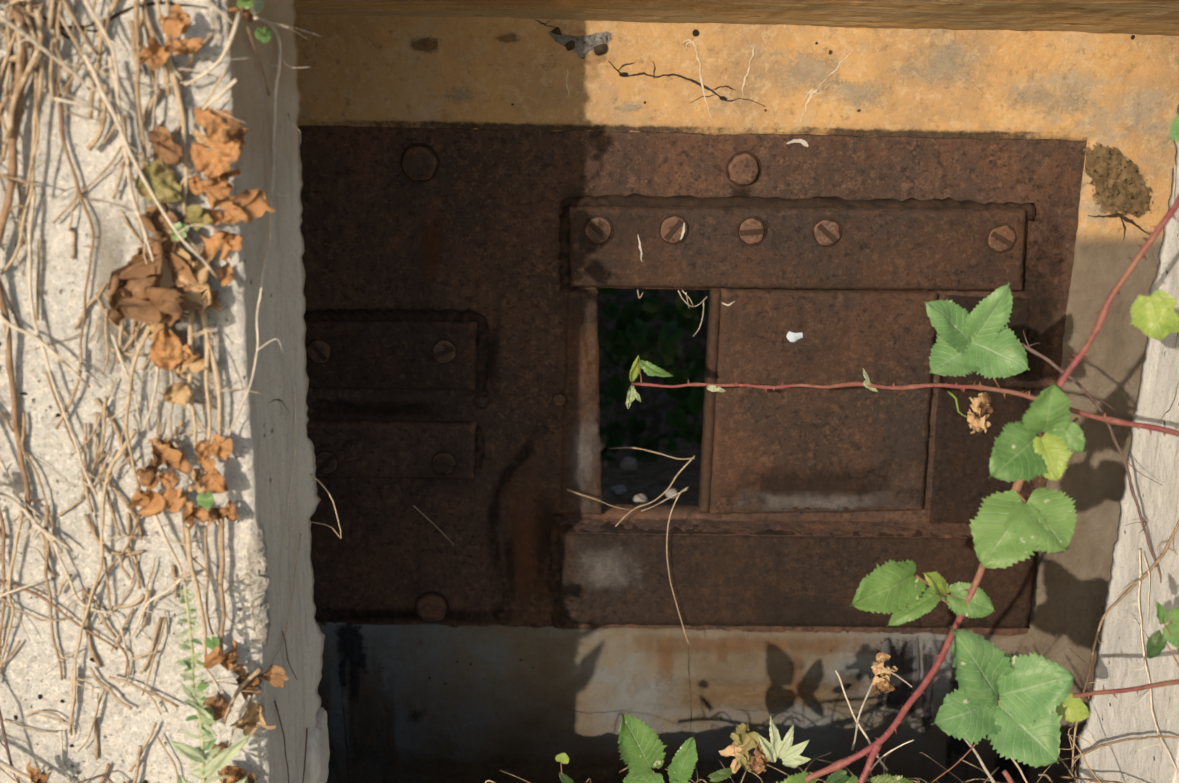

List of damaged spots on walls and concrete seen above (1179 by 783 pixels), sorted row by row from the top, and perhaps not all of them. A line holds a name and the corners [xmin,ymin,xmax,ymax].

spalling [549,27,612,59]
crack [608,61,766,107]
rust [726,151,761,197]
spalling [1083,142,1154,218]
rust [658,214,689,244]
rust [736,216,767,247]
rust [1016,231,1063,423]
rust [742,467,888,509]
rust [328,591,506,623]